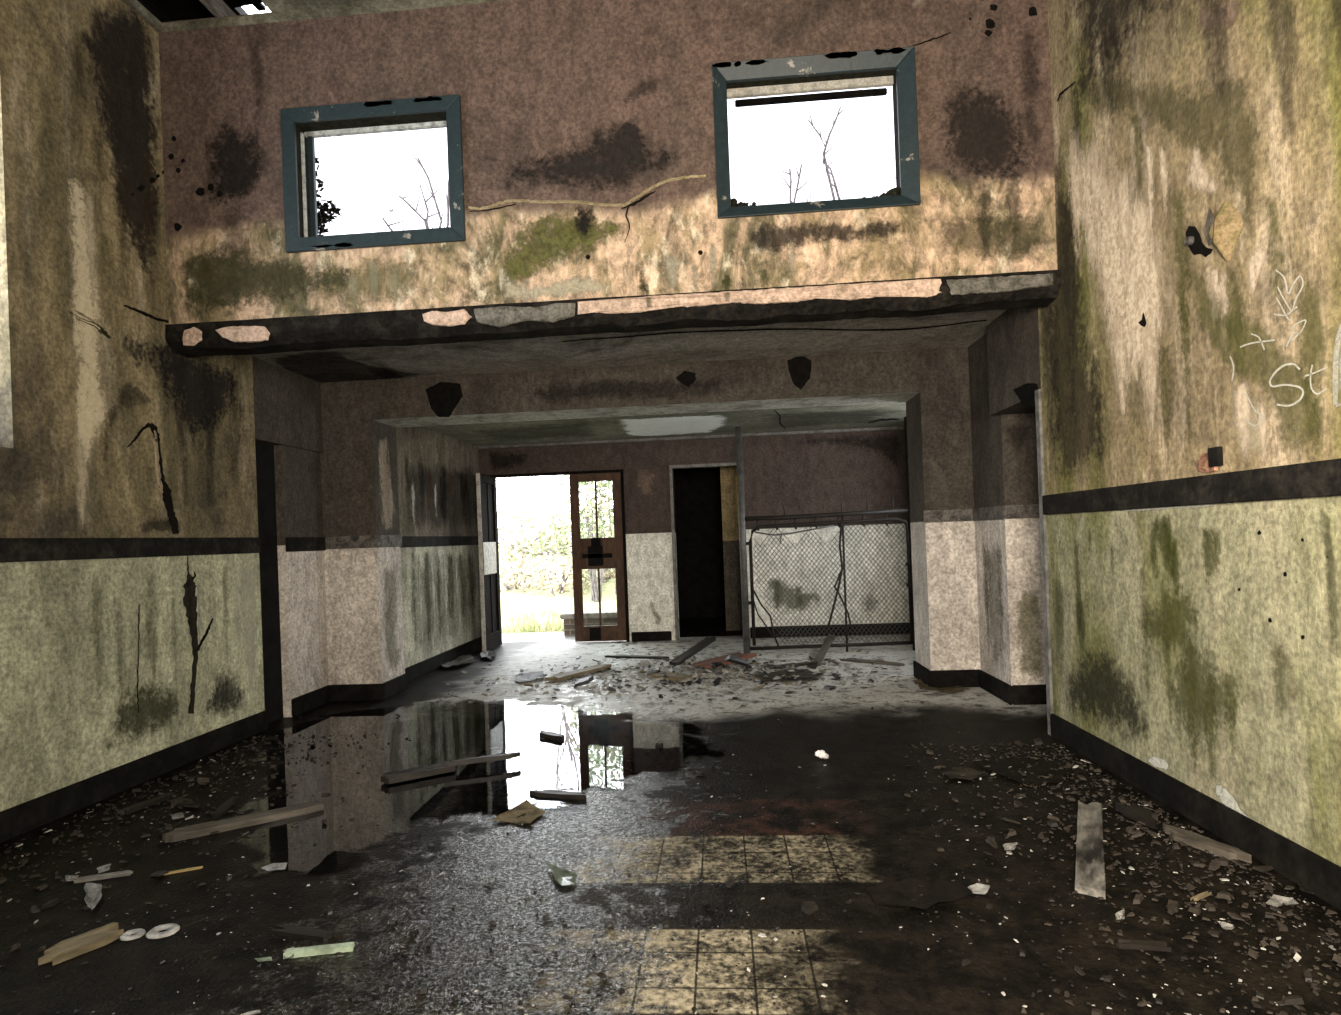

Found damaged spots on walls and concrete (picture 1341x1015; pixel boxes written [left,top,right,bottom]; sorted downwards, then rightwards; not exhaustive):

damp [1074,0,1172,93]
damp [83,8,160,270]
damp [206,124,263,202]
damp [507,122,670,190]
damp [945,87,1026,177]
crack [468,175,706,241]
spalling [182,326,270,346]
spalling [422,273,1053,327]
damp [1048,170,1100,470]
crack [127,422,214,714]
damp [108,685,178,747]
damp [1069,653,1146,736]